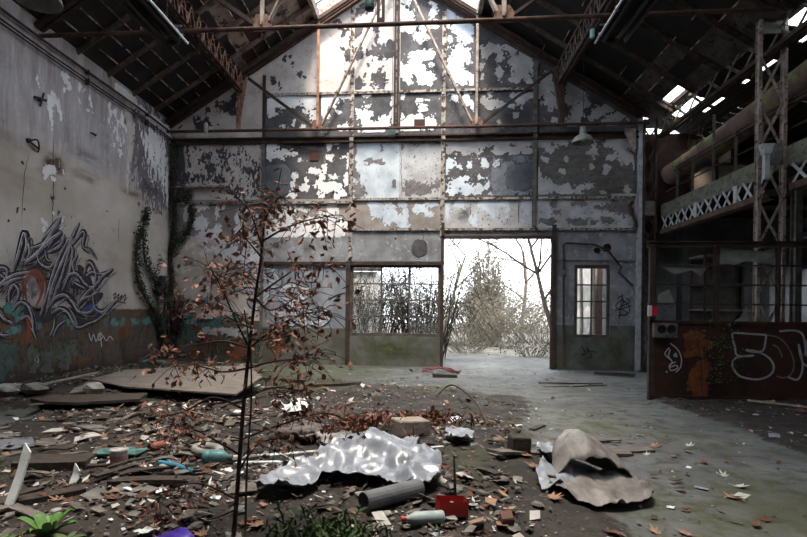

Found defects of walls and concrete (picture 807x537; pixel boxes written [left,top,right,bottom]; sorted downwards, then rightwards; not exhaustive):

peeling [267,0,630,133]
peeling [37,70,102,132]
peeling [42,162,65,182]
peeling [99,83,635,263]
peeling [40,210,72,233]
corrosion [683,330,716,396]